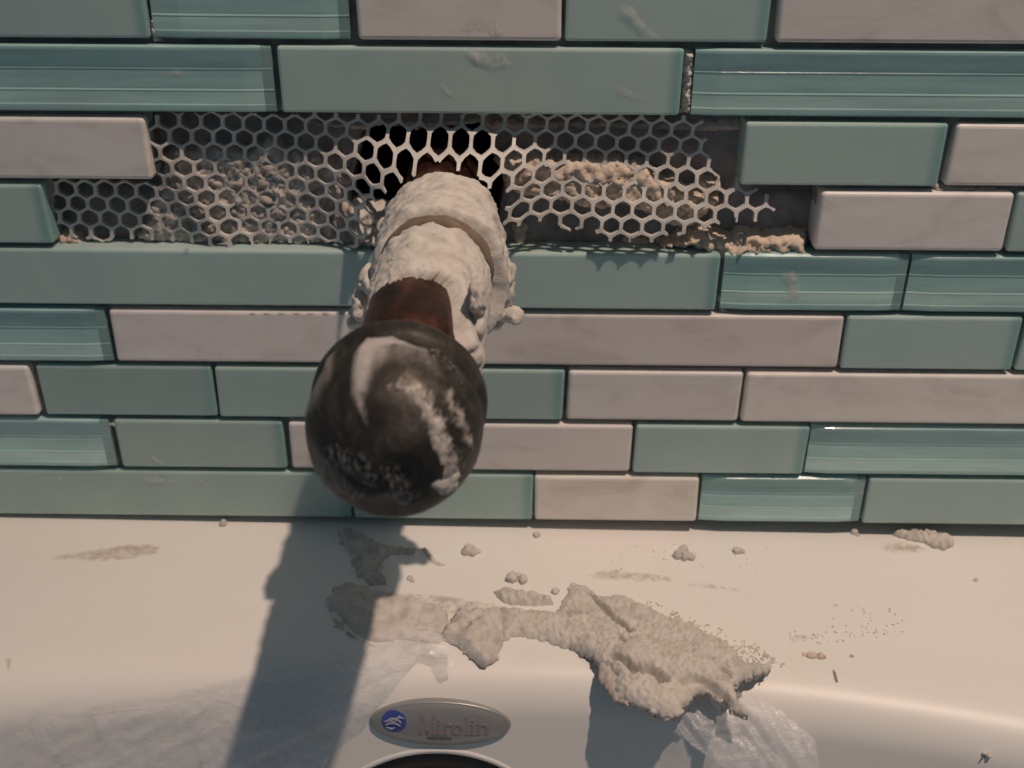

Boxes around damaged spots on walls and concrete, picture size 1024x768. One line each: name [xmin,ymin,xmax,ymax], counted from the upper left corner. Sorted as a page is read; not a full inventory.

peeling [58,110,812,244]